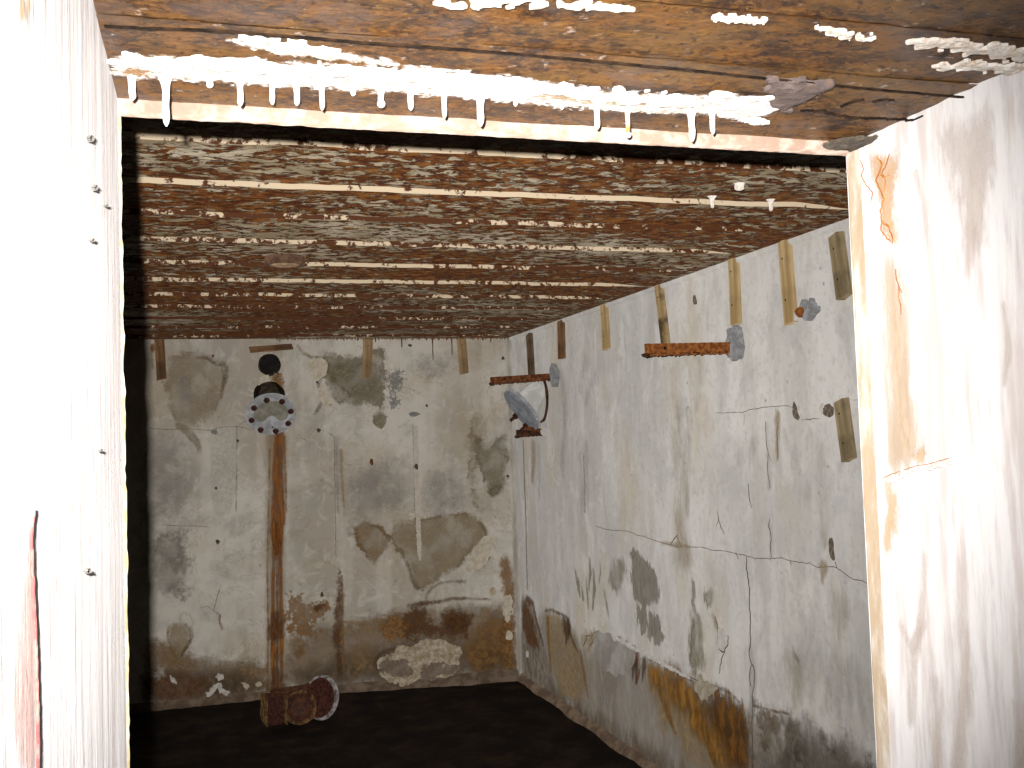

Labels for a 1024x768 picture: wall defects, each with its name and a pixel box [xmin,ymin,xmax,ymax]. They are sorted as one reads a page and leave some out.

water stain [107,34,779,126]
peeling [764,75,835,114]
rust [860,154,895,245]
rust [143,432,588,701]
crack [596,405,866,768]
water stain [525,617,714,768]
water stain [746,709,872,768]